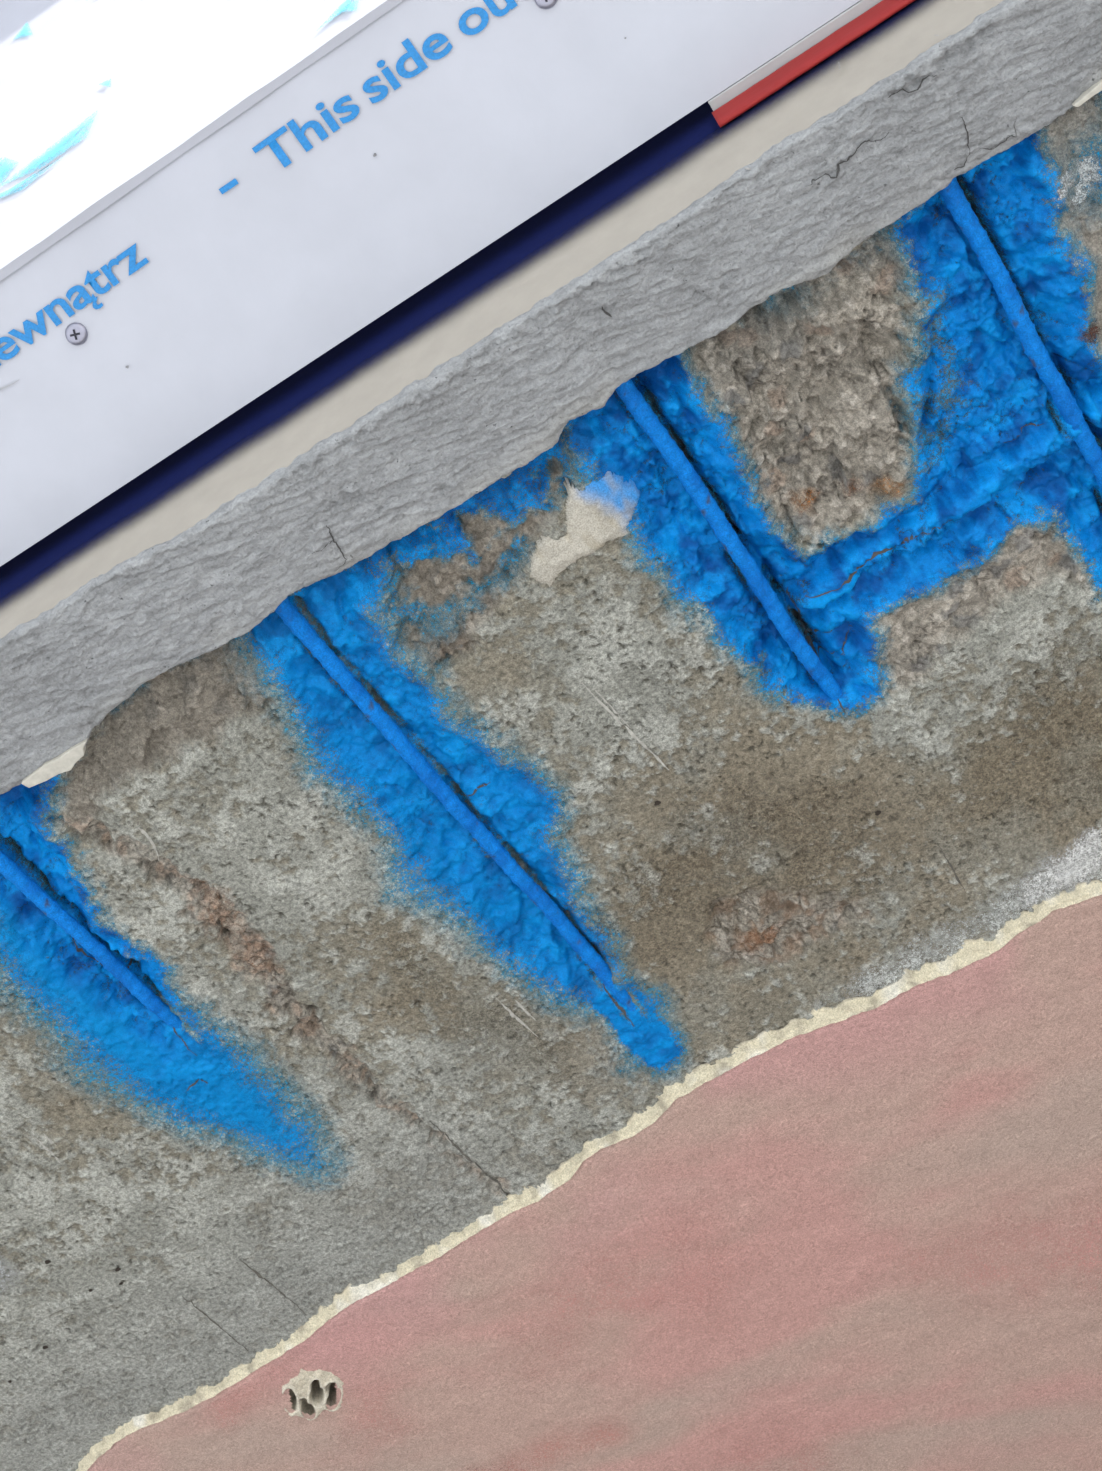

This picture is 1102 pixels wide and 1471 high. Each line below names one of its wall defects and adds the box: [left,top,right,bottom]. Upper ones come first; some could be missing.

crack [808,75,936,186]
spalling [0,79,1102,1187]
spalling [76,880,1102,1471]